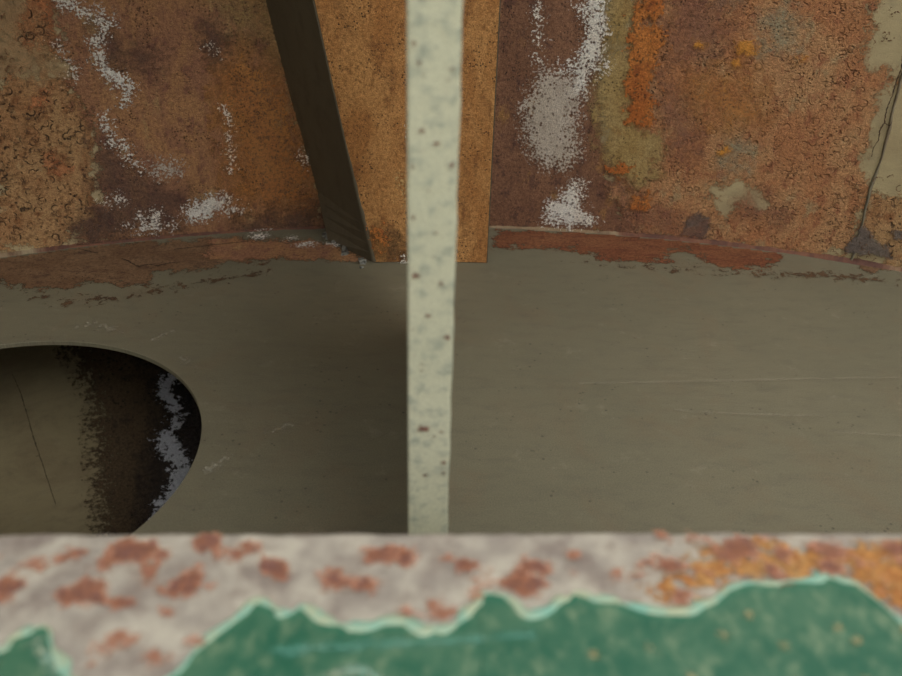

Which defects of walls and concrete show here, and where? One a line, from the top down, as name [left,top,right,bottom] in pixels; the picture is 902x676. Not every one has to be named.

water stain [44,0,190,184]
rust [0,0,415,308]
water stain [217,103,240,175]
water stain [514,0,616,232]
rust [449,0,902,286]
crack [871,63,902,157]
water stain [95,190,252,236]
peeling [844,226,902,260]
rust [0,546,88,603]
rust [315,566,378,595]
rust [361,544,417,568]
rust [440,554,553,599]